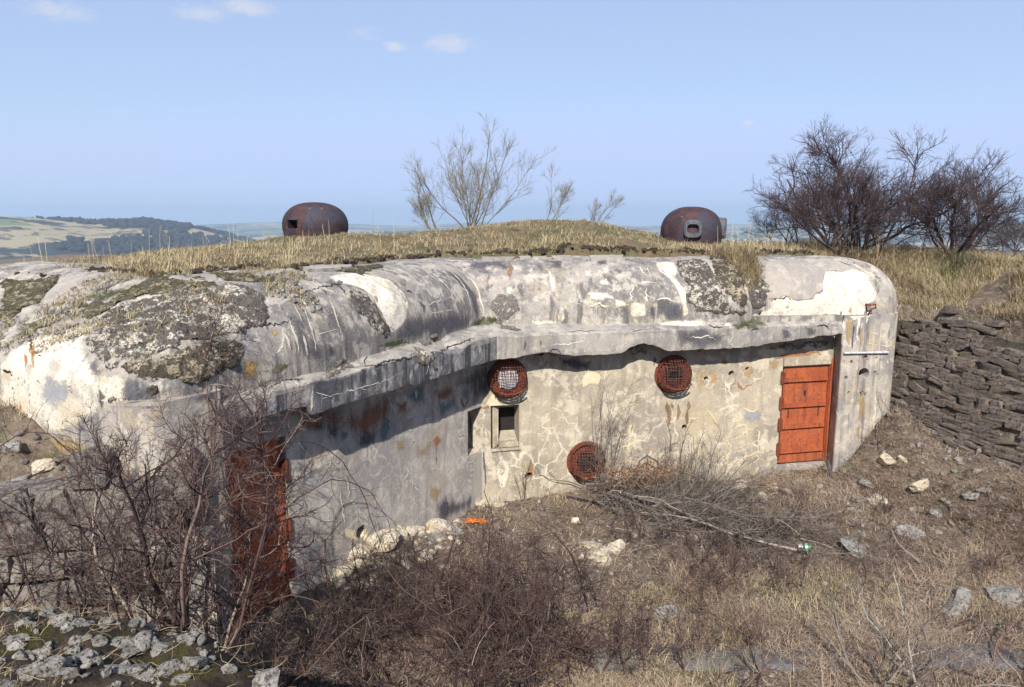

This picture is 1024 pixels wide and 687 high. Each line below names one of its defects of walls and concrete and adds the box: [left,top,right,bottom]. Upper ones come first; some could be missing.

damp [549,261,562,293]
damp [582,260,737,348]
peeling [656,259,876,320]
damp [123,380,152,400]
crack [316,338,474,404]
crack [534,400,569,437]